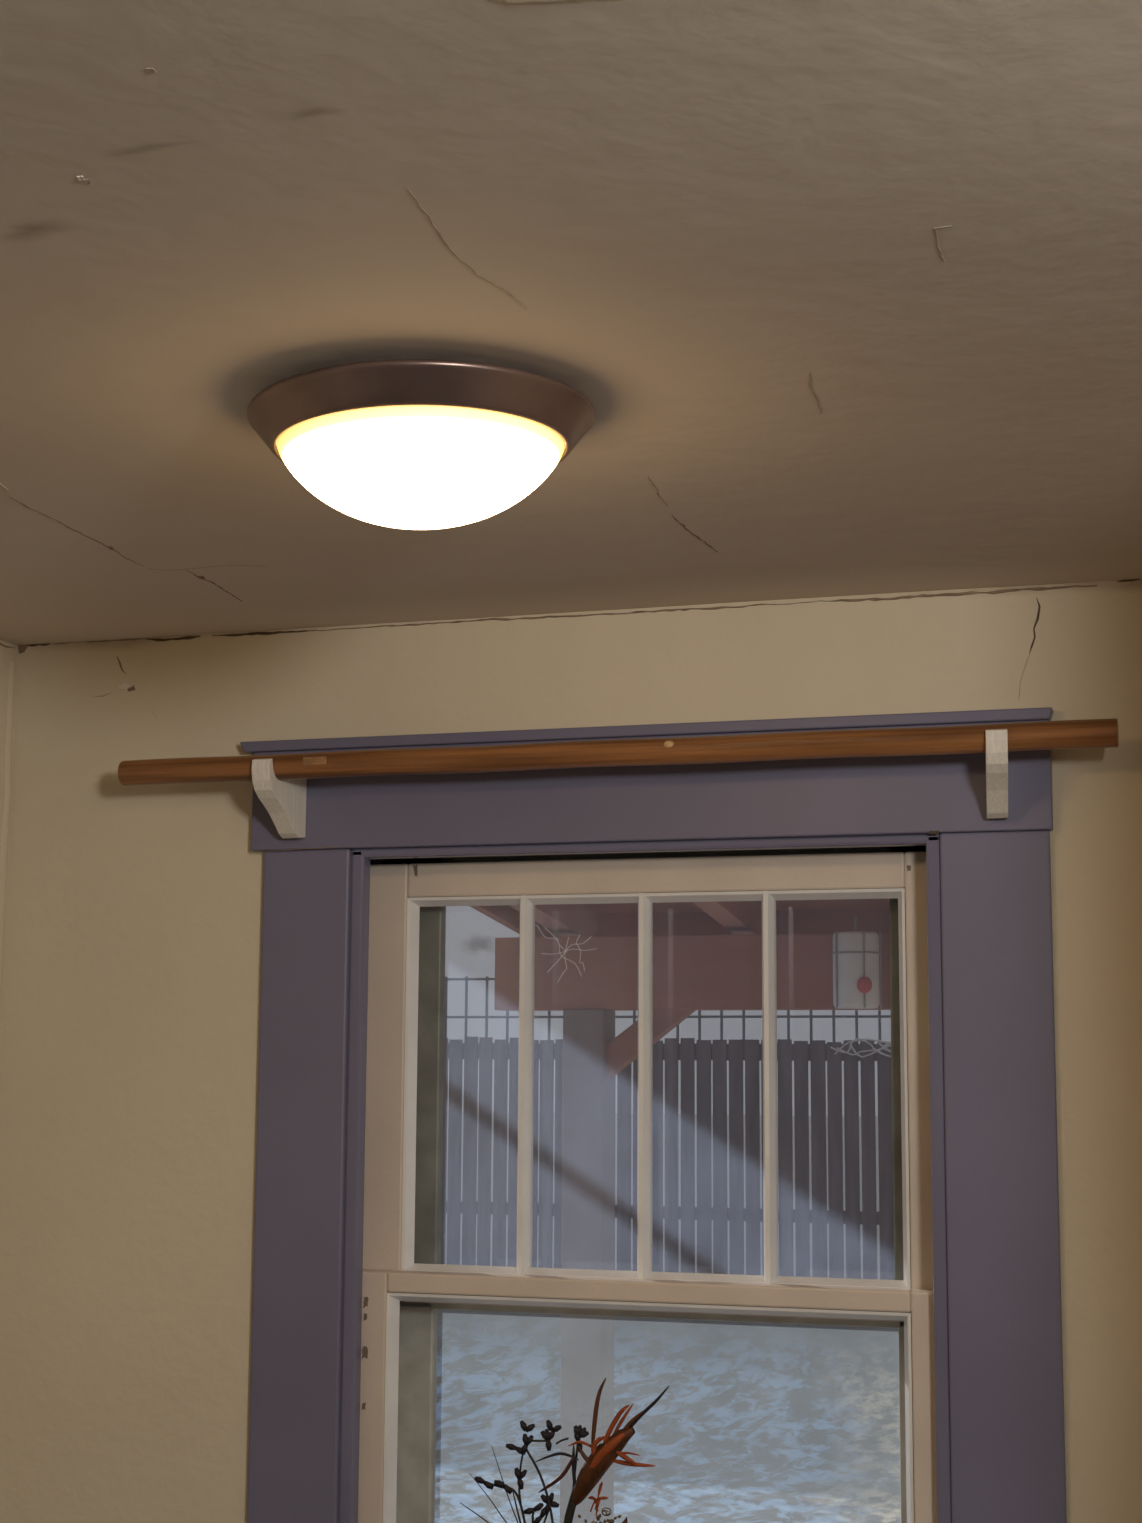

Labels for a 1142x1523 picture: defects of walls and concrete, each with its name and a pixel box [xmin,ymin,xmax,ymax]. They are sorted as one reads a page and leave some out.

crack [407,188,527,310]
crack [0,476,1142,700]